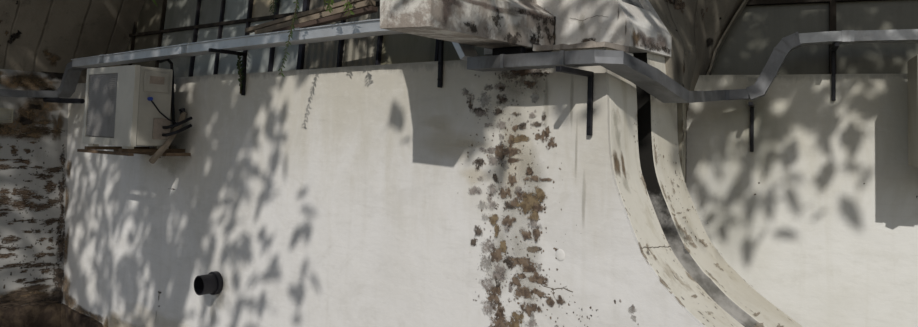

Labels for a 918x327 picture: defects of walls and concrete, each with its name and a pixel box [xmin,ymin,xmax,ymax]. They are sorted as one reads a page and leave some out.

spalling [0,124,66,308]
peeling [462,69,598,327]
spalling [638,238,717,327]
peeling [653,136,708,255]